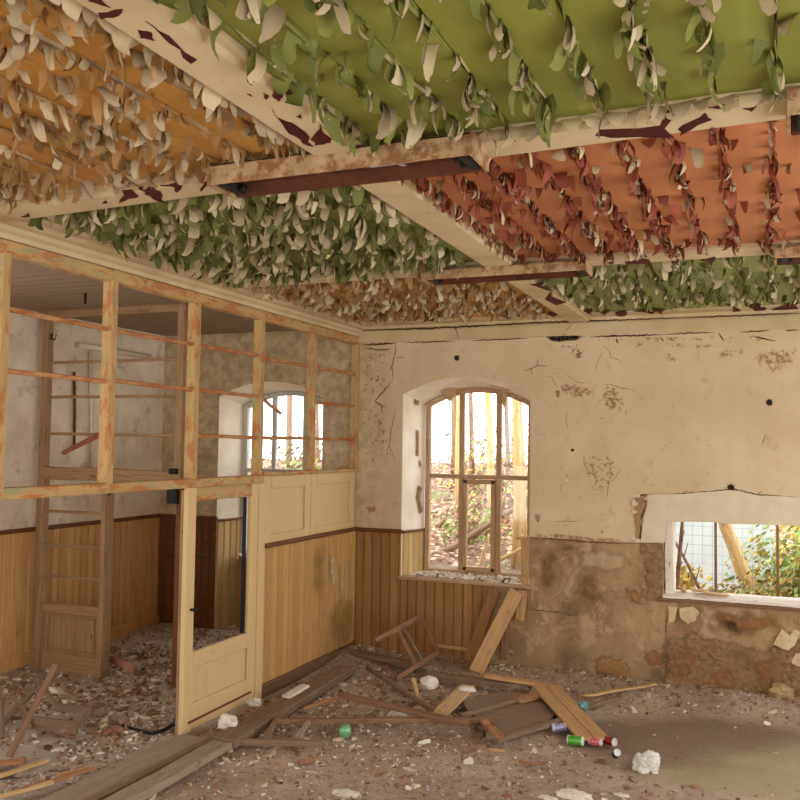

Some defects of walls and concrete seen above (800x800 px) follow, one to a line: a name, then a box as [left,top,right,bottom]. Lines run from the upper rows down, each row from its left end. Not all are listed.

peeling [0,0,800,327]
crack [362,313,796,460]
crack [677,489,790,497]
flaking render [626,495,666,605]
flaking render [639,606,800,698]